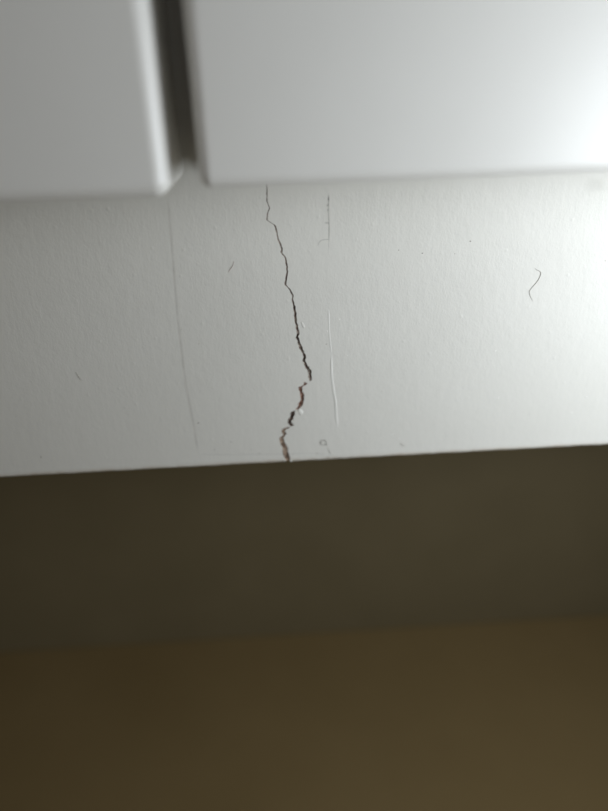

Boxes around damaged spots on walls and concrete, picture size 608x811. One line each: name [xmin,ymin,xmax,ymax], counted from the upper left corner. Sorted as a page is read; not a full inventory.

crack [266,185,312,462]